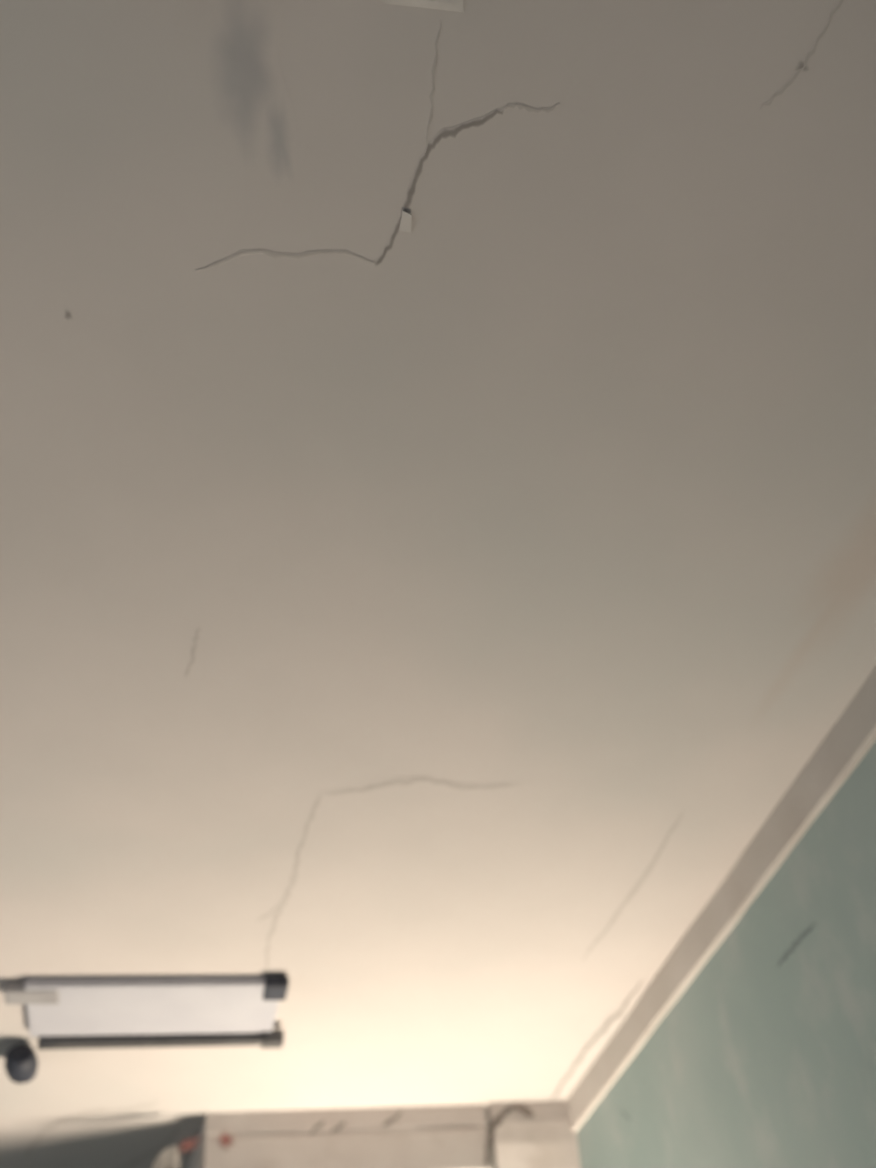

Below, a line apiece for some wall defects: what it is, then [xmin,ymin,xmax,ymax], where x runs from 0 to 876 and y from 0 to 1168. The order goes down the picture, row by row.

crack [195,20,560,272]